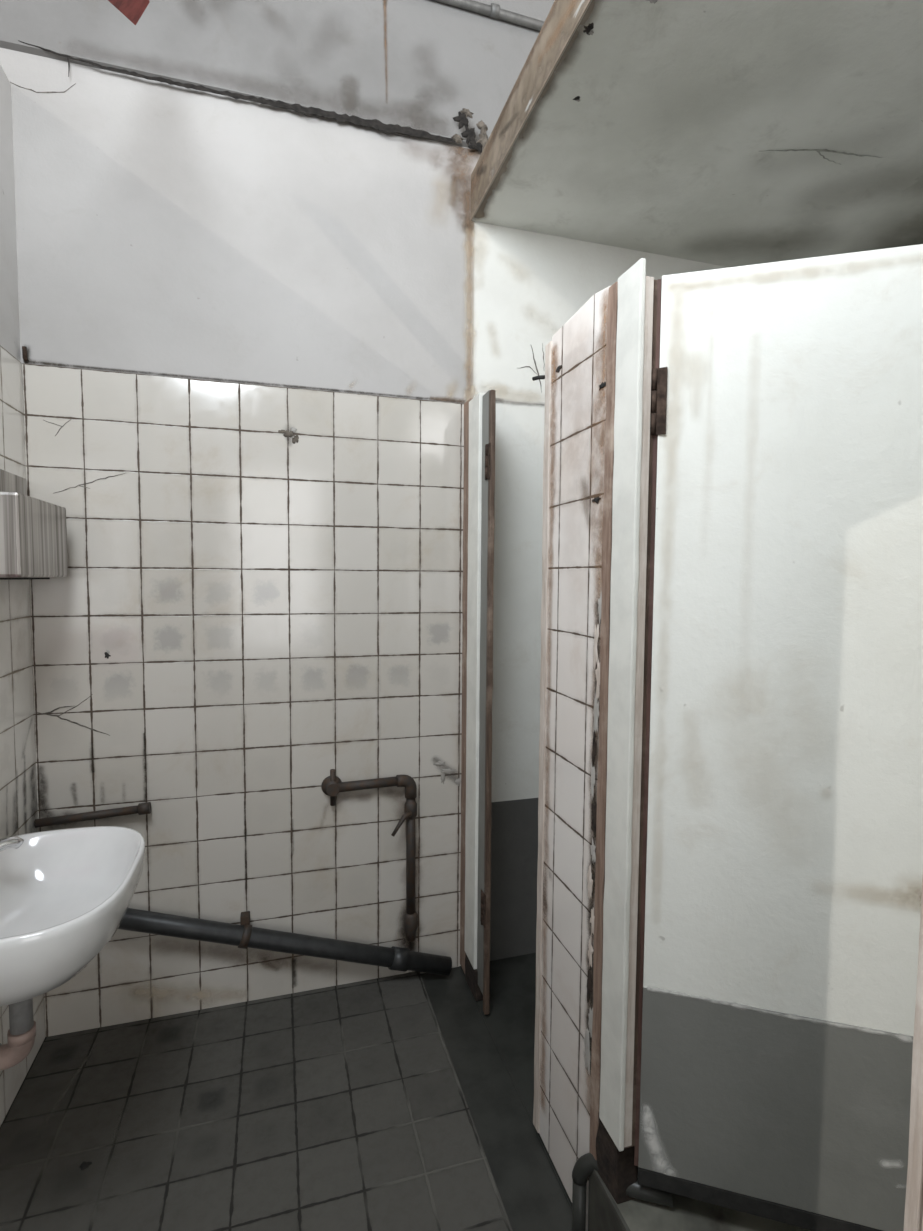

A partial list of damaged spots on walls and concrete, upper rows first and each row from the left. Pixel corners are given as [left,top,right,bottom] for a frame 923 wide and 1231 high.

rust [451,0,598,227]
crack [759,149,883,164]